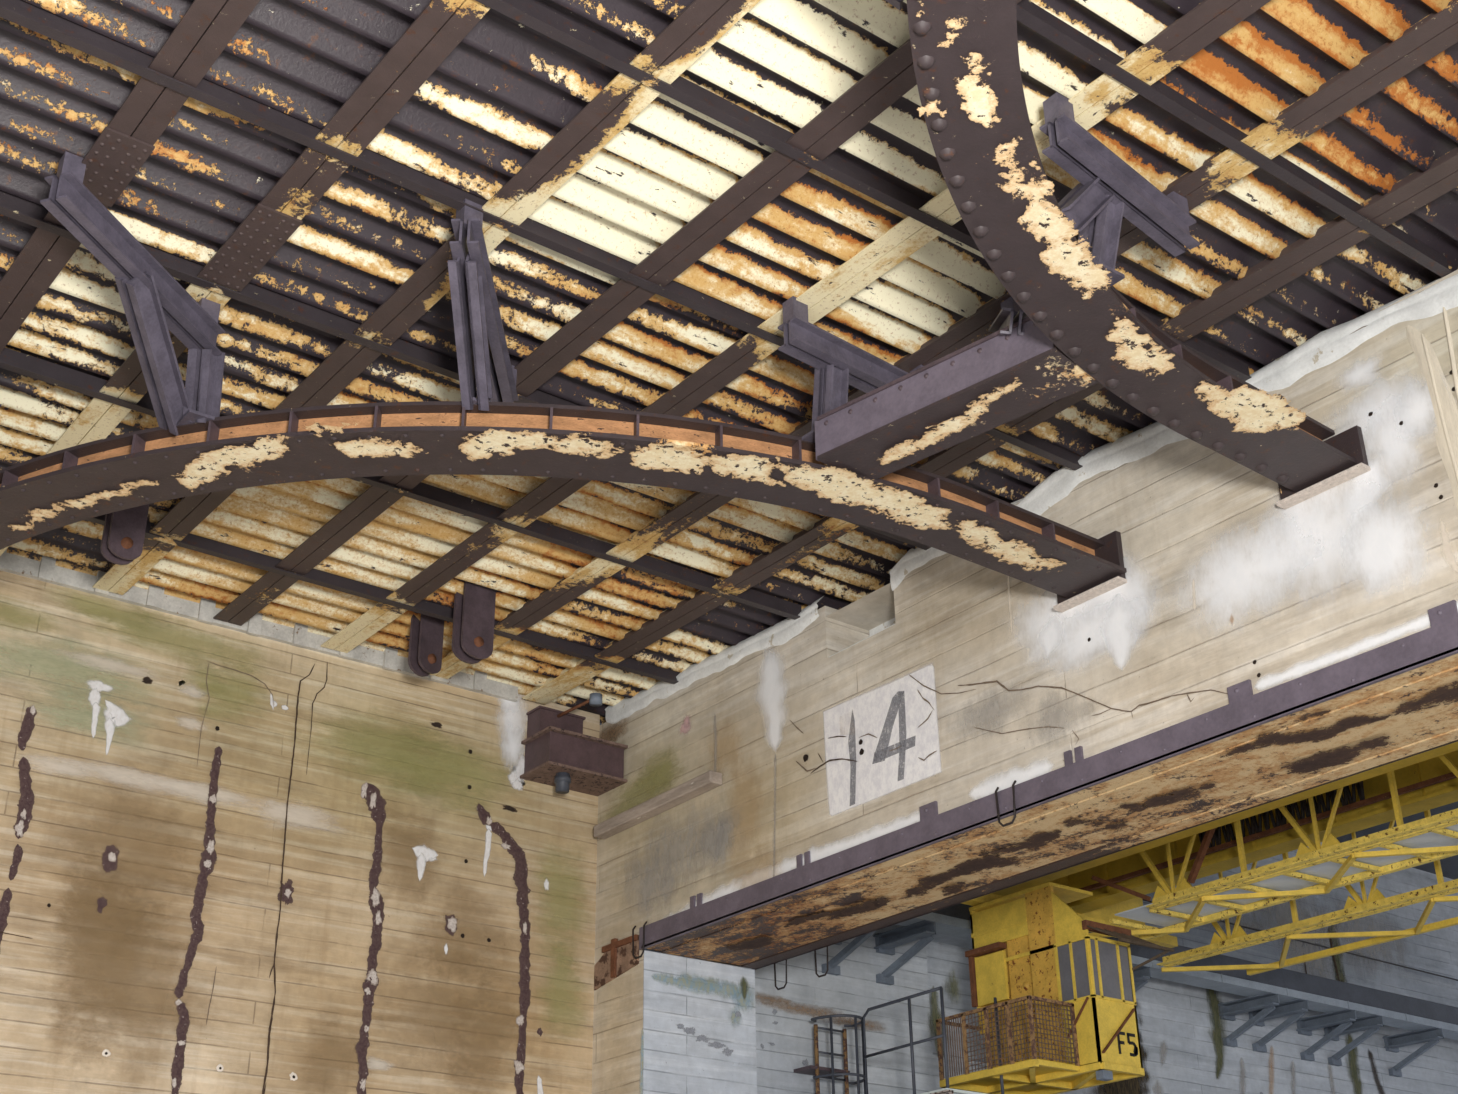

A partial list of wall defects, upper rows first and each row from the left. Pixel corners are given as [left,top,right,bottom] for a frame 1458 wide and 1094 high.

water stain [1192,307,1458,619]
water stain [1008,564,1147,668]
water stain [1256,615,1430,689]
water stain [759,655,785,750]
crack [790,675,1228,774]
water stain [970,761,1052,799]
crack [197,661,328,1094]
water stain [670,812,920,916]
water stain [1329,925,1345,982]
water stain [1096,1034,1149,1094]